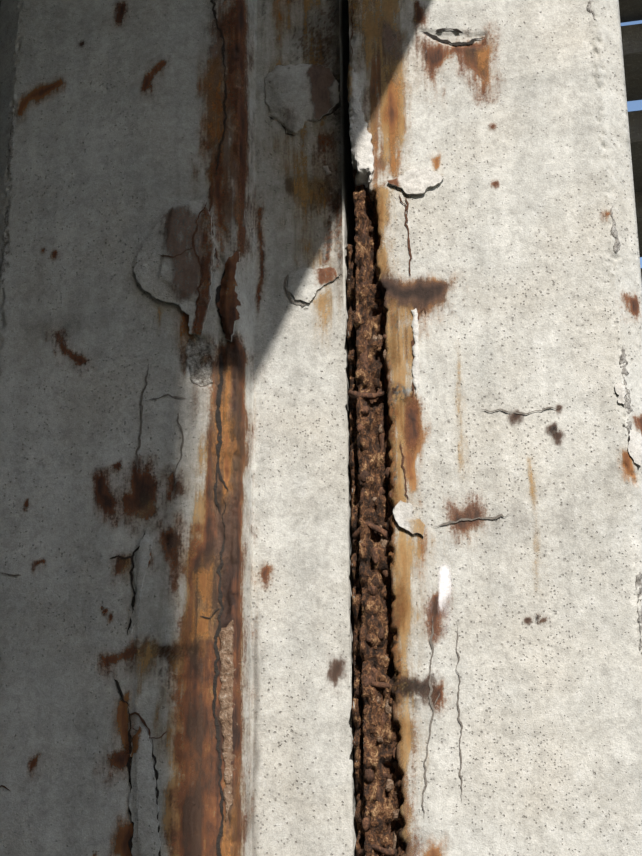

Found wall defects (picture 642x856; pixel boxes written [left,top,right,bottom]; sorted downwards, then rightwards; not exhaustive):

crack [420,28,484,46]
rust [413,1,498,101]
rust [197,0,265,310]
peeling [134,200,242,387]
crack [135,364,187,477]
rust [92,335,253,856]
crack [161,0,238,856]
rust [261,564,273,587]
spalling [287,62,426,856]
rust [348,0,448,856]
rust [446,495,486,537]
crack [114,679,168,856]